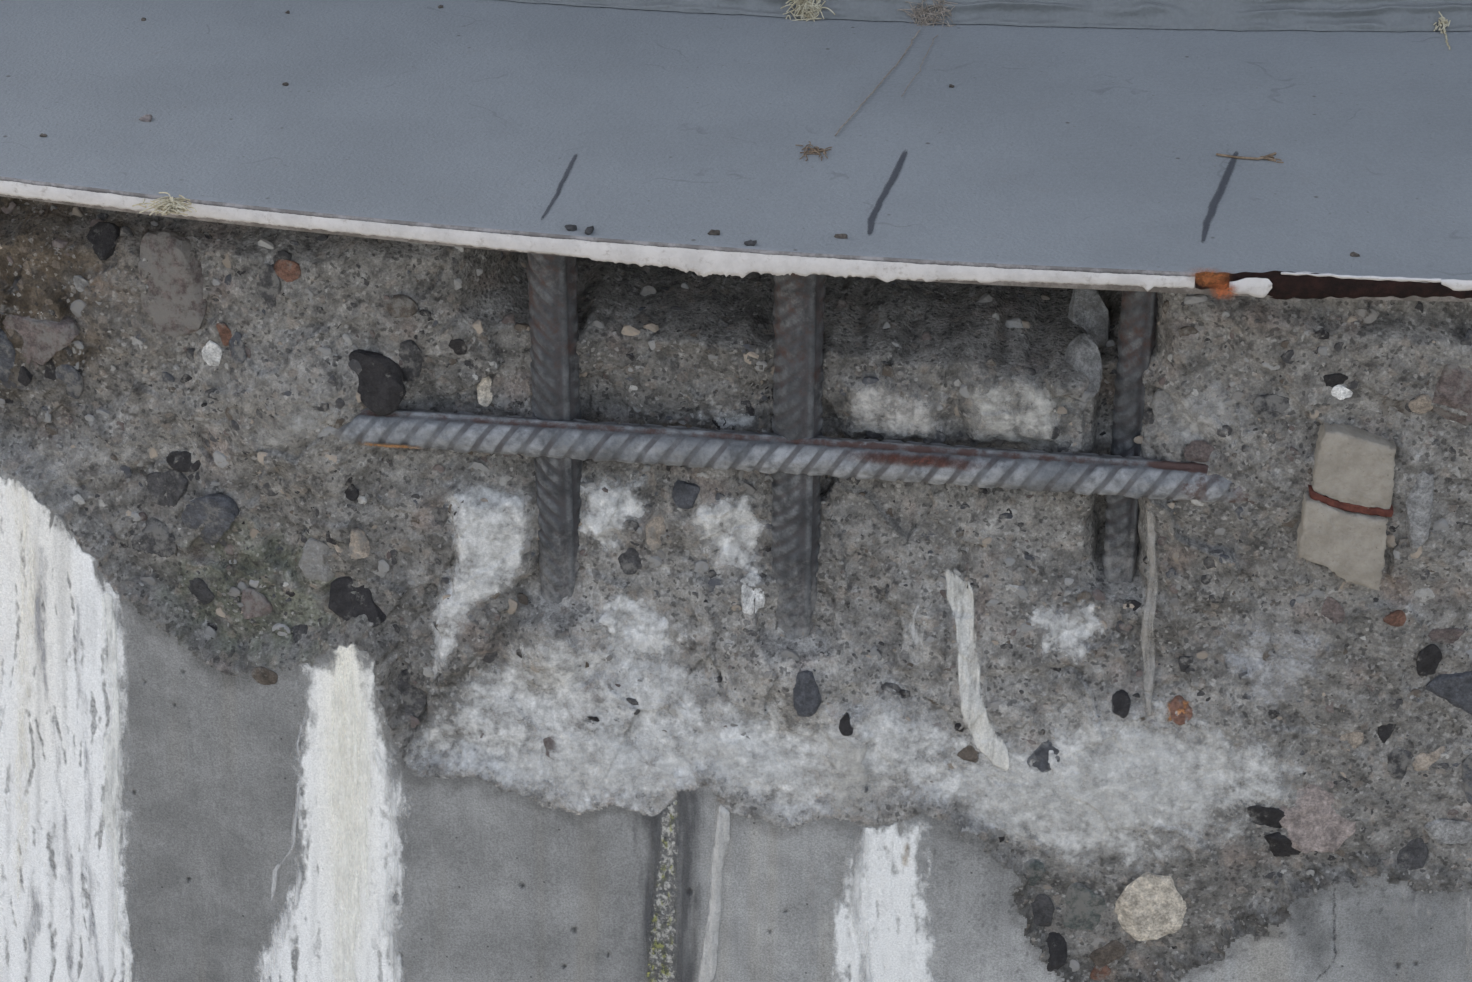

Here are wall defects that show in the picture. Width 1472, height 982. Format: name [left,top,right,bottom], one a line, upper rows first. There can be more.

corrosion [1196,271,1233,297]
peeling [1195,271,1472,300]
spalling [317,253,1249,503]
spalling [534,456,583,604]
spalling [771,472,821,640]
spalling [1102,495,1140,583]
leakage [0,473,133,982]
spalling [479,703,559,769]
spalling [562,661,644,753]
leakage [421,479,1302,982]
leakage [1229,636,1317,696]
leakage [260,645,406,982]